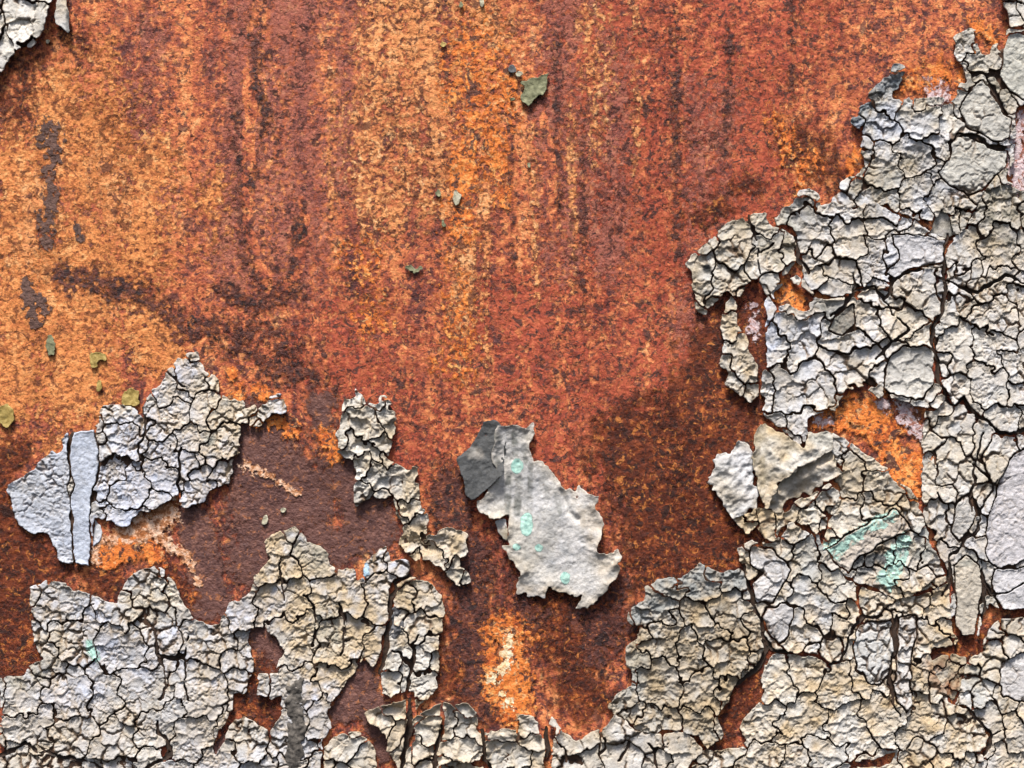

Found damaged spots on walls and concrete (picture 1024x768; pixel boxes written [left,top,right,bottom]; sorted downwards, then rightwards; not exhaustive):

peeling [0,0,70,73]
peeling [6,352,287,566]
peeling [549,0,1024,768]
rust [810,383,935,508]
crack [831,234,1024,620]
peeling [0,389,545,768]
crack [145,626,190,768]
rust [212,618,285,754]
rust [327,655,414,764]
crack [378,573,444,768]
crack [828,614,901,715]
rust [928,608,1024,708]